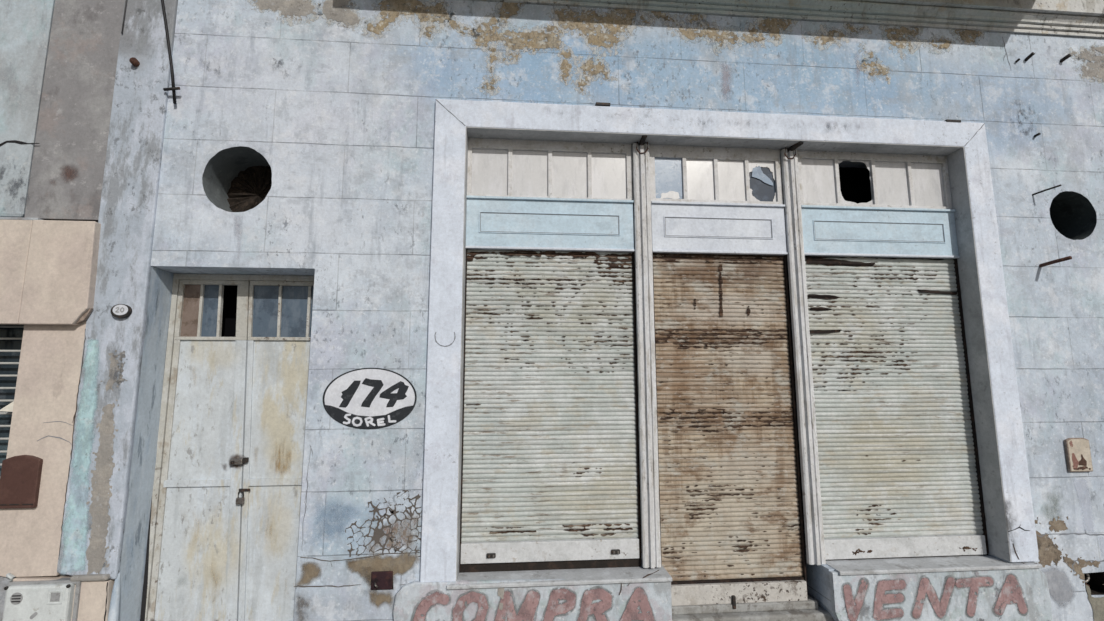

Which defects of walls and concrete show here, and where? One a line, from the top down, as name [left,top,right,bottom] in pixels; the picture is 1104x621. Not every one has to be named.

peeling [248,0,984,97]
peeling [1069,44,1104,83]
crack [0,139,40,147]
rust [467,250,633,373]
rust [653,253,789,365]
rust [805,256,957,395]
crack [294,446,422,587]
rust [563,523,633,539]
rust [659,390,801,575]
rust [855,505,901,535]
spalling [1035,516,1100,586]